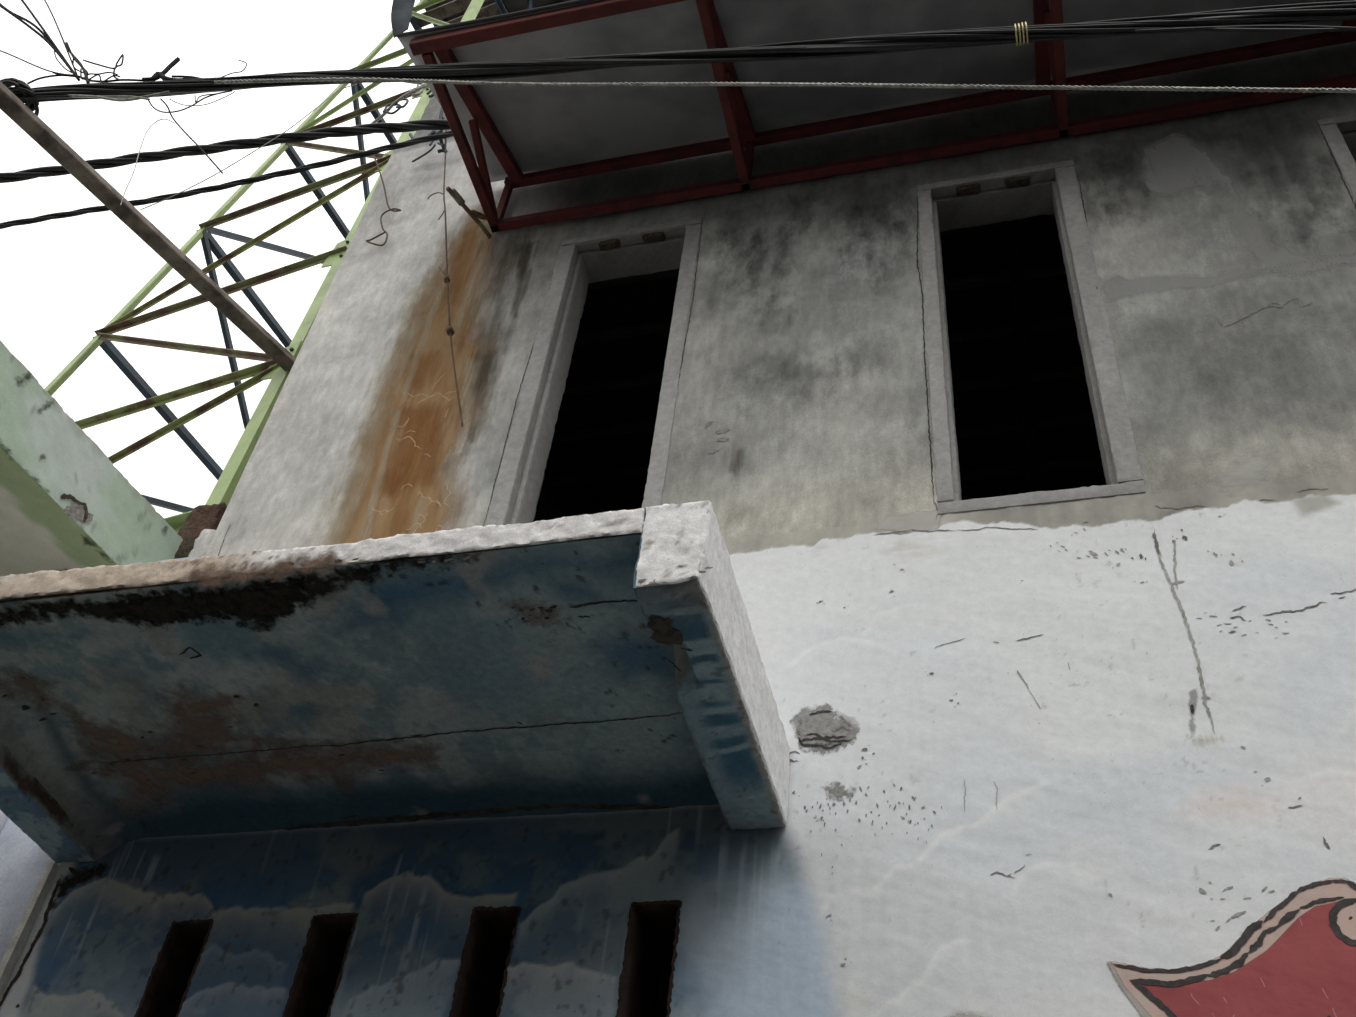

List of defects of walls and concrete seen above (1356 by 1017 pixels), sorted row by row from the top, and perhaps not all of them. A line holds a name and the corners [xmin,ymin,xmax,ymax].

leakage [495,243,531,292]
corrosion [334,211,493,545]
spalling [61,494,94,523]
leakage [0,553,479,632]
crack [570,600,637,618]
crack [1152,505,1215,734]
crack [179,647,202,659]
crack [82,712,680,765]
spalling [790,704,875,769]
peeling [792,782,942,846]
leakage [51,864,107,908]